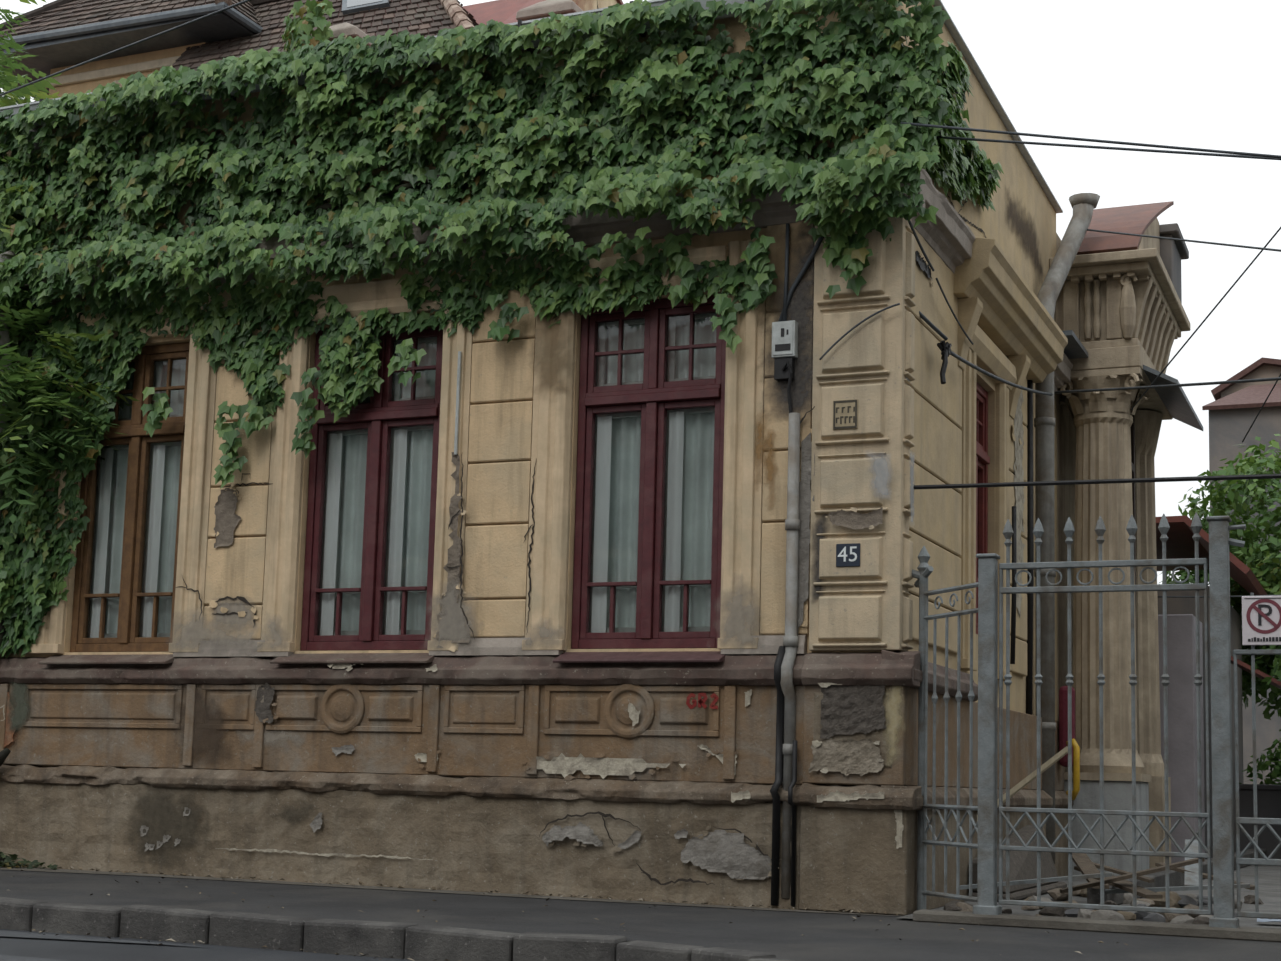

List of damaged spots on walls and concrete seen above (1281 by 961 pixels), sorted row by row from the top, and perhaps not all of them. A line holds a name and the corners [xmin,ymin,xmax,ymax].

spalling [211,482,242,548]
spalling [433,452,470,652]
flaking render [209,600,259,626]
spalling [808,683,886,776]
peeling [520,753,686,781]
peeling [817,791,904,849]